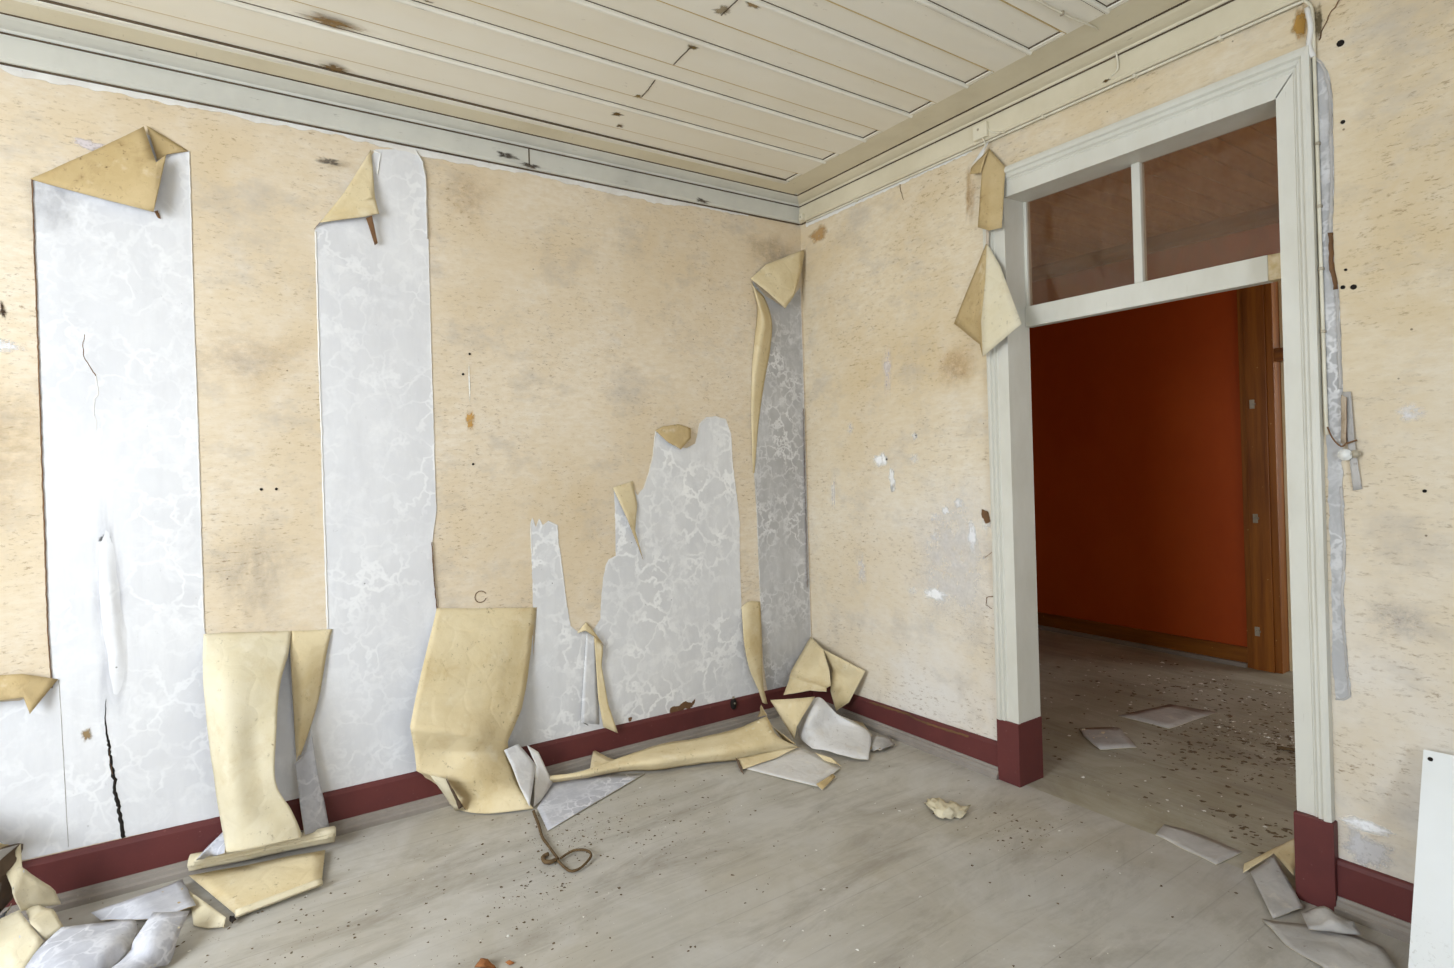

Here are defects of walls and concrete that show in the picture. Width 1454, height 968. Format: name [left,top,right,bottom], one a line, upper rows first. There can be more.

peeling [0,134,220,860]
crack [104,701,126,838]
peeling [275,149,437,801]
peeling [508,282,811,748]